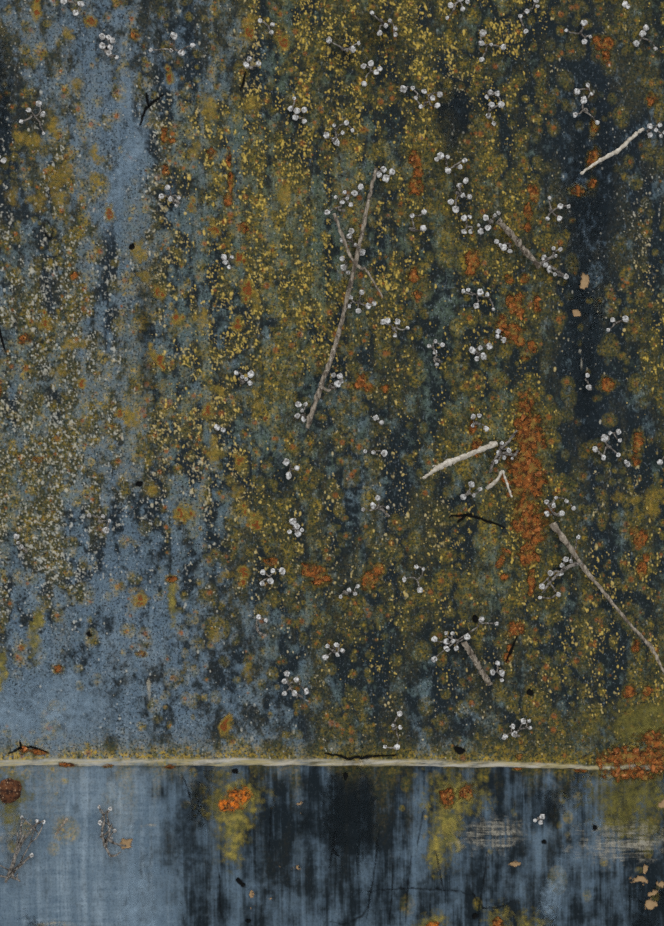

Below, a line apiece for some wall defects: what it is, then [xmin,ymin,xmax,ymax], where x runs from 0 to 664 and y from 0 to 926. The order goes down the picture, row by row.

corrosion [495,390,548,597]
corrosion [301,562,332,587]
corrosion [362,563,385,591]
corrosion [213,773,259,861]
corrosion [428,775,483,867]
corrosion [575,730,664,843]